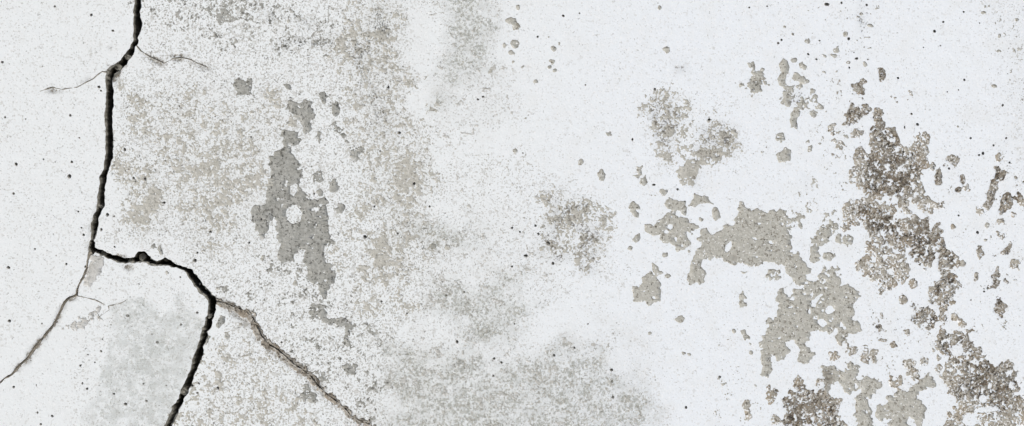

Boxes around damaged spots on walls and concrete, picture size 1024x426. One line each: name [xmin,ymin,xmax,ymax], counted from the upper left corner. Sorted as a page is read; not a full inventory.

crack [0,0,376,426]
peeling [110,0,649,426]
peeling [627,5,1024,426]